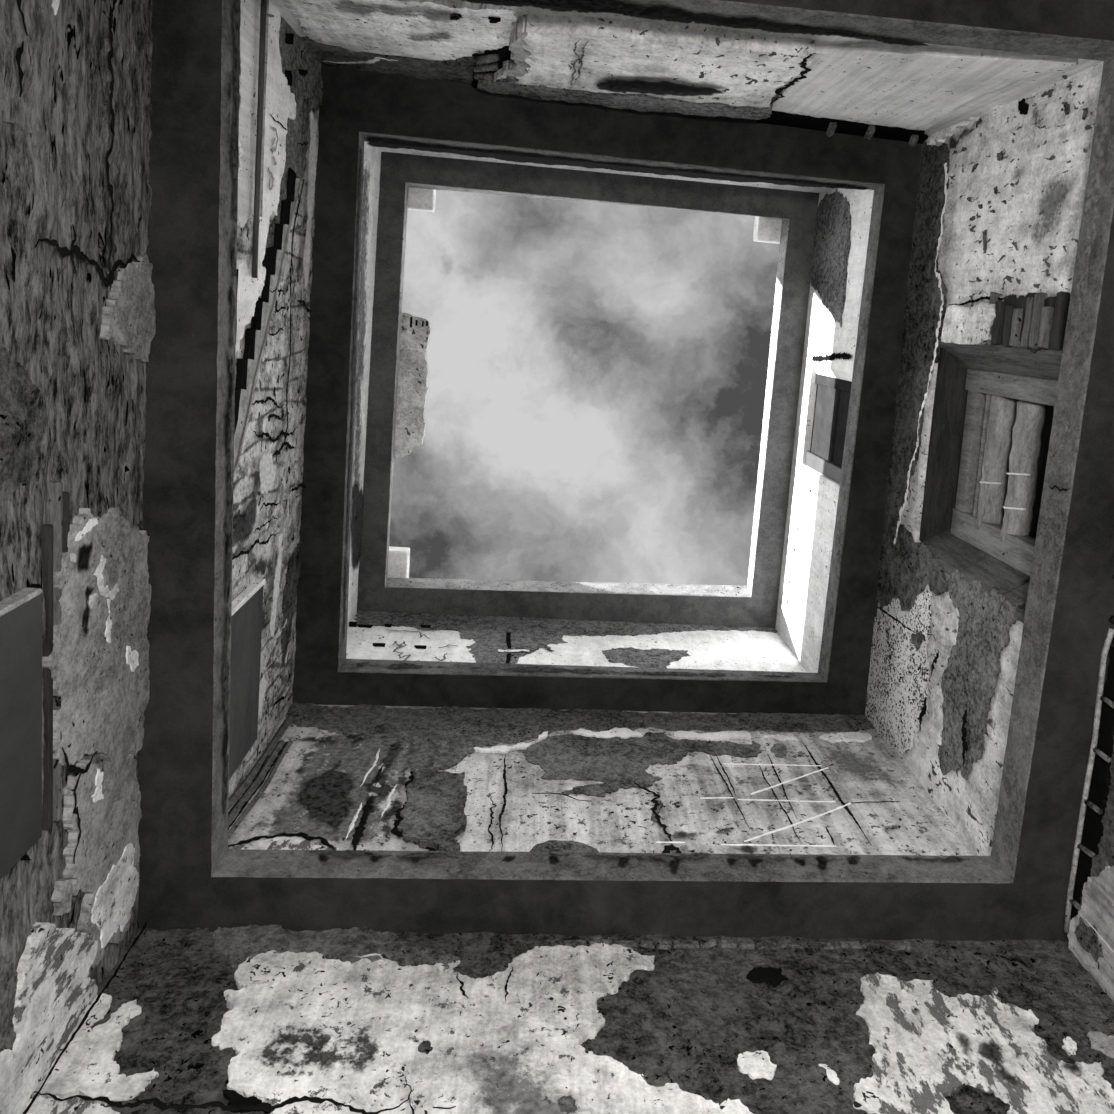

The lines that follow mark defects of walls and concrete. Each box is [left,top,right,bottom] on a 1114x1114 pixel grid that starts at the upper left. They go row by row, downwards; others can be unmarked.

crack [34,0,153,286]
spalling [98,0,156,362]
crack [232,483,306,560]
crack [252,396,298,456]
spalling [281,540,301,667]
spalling [285,110,1025,852]
flaking render [0,627,1114,1114]
crack [23,922,456,1114]